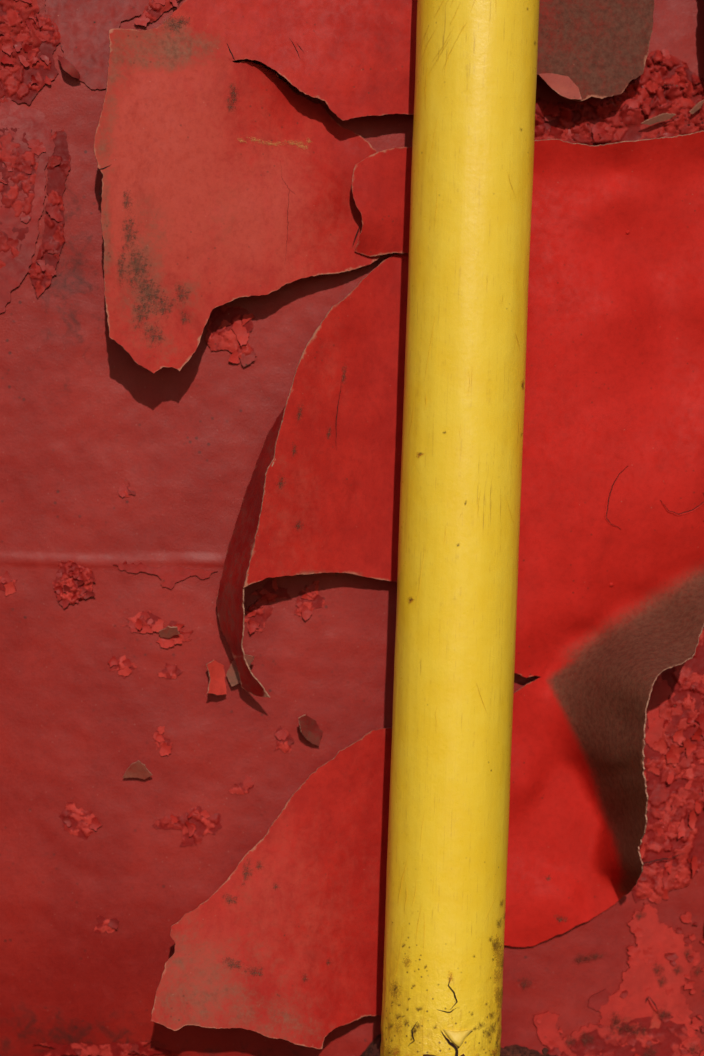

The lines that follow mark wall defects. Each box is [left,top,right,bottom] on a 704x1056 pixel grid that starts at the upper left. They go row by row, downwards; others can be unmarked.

peeling [0,0,80,106]
peeling [0,127,71,298]
peeling [94,0,417,698]
peeling [504,0,704,947]
peeling [52,560,96,609]
peeling [274,715,323,753]
peeling [151,726,392,1049]